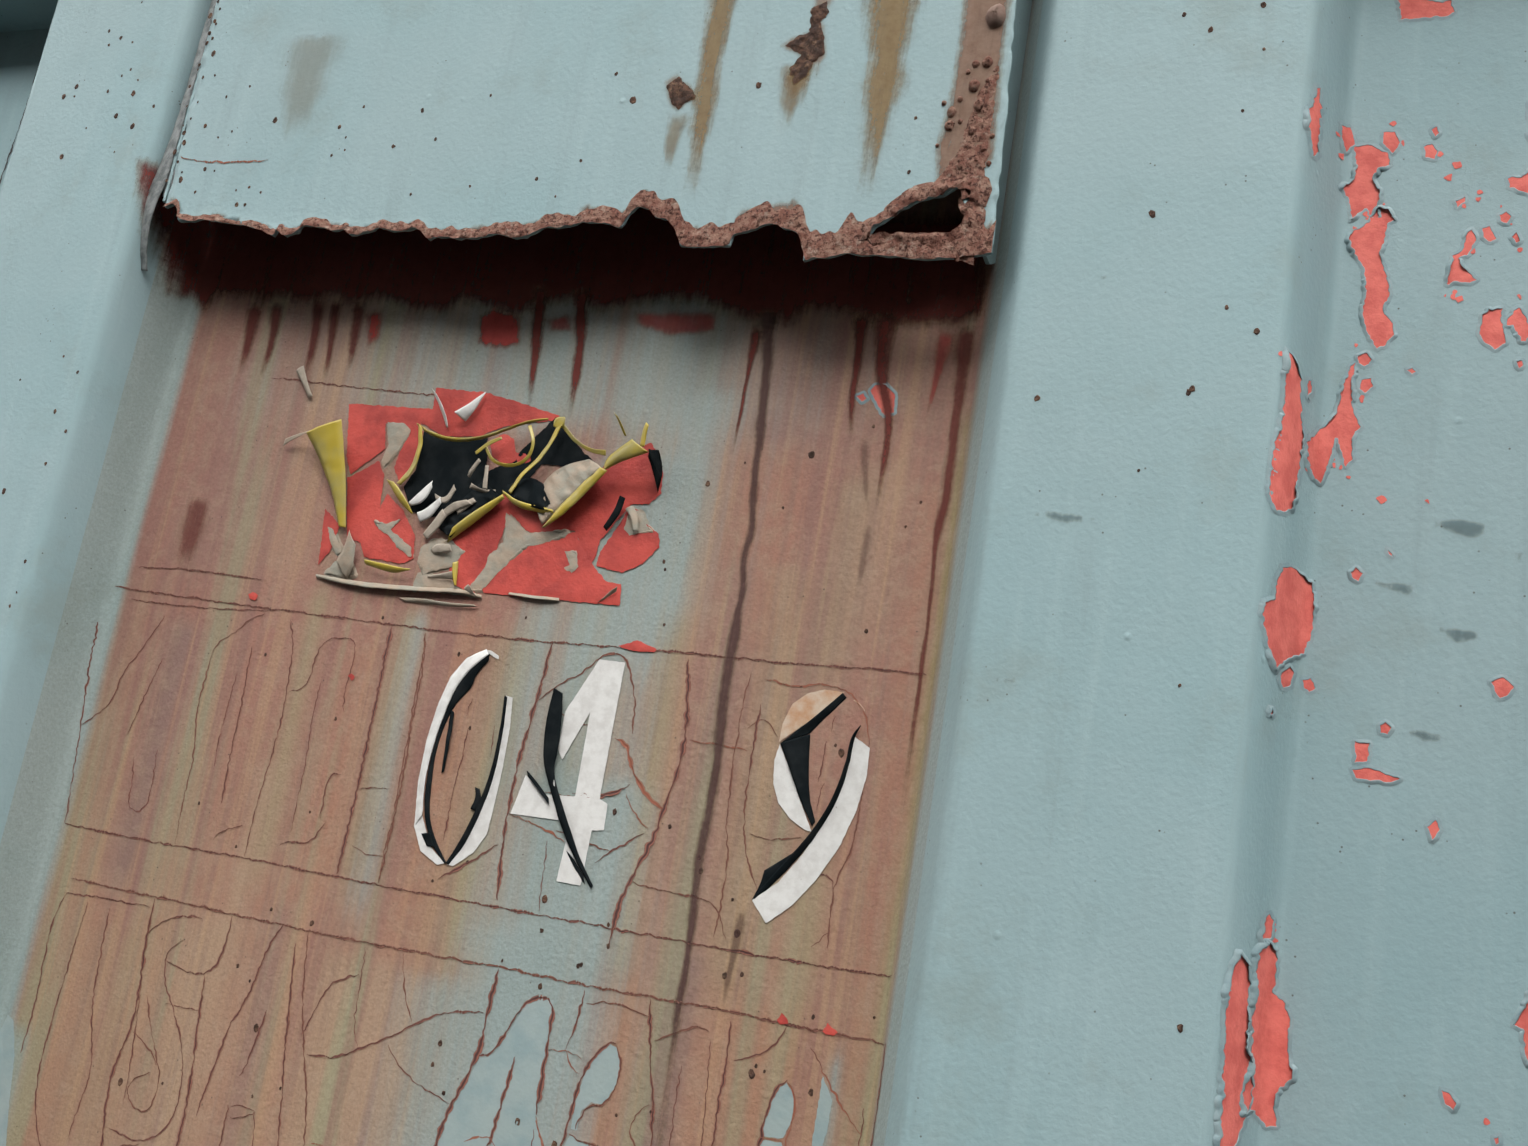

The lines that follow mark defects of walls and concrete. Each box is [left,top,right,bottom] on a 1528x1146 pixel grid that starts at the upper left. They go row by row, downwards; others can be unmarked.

peeling [1443,168,1528,302]
peeling [1475,294,1528,372]
peeling [387,389,593,522]
crack [64,566,926,977]
peeling [414,640,656,903]
rust [138,0,1007,1060]
peeling [615,414,663,491]
peeling [752,690,870,923]
peeling [1257,562,1319,720]
peeling [1348,719,1403,786]
crack [20,878,886,1146]
peeling [1213,910,1298,1146]